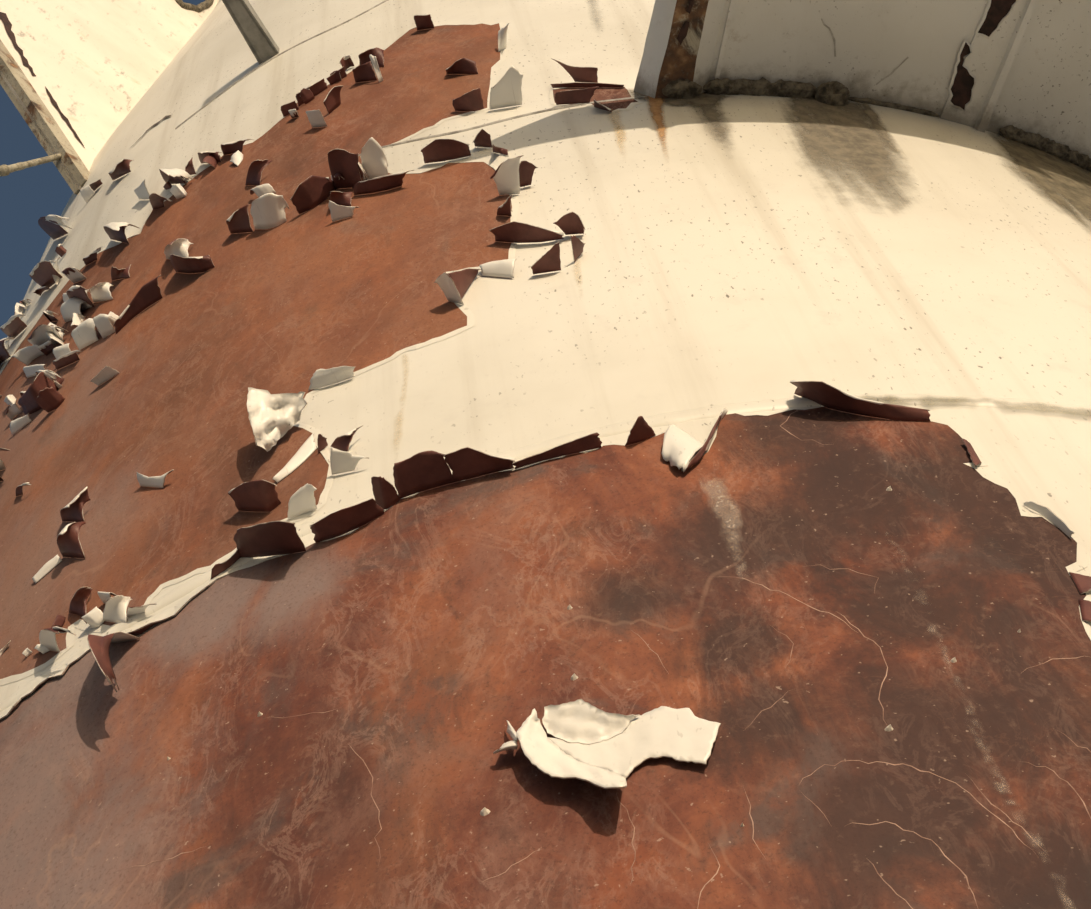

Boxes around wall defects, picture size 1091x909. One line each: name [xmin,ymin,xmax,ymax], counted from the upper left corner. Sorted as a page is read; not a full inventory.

peeling [948,0,1018,112]
water stain [789,97,903,200]
water stain [994,136,1091,225]
peeling [0,12,586,686]
peeling [0,380,1091,909]
crack [711,576,888,726]
crack [350,746,382,861]
crack [616,793,636,882]
crack [697,843,720,909]
crack [744,789,766,859]
crack [800,760,1039,909]
crack [1028,762,1091,818]